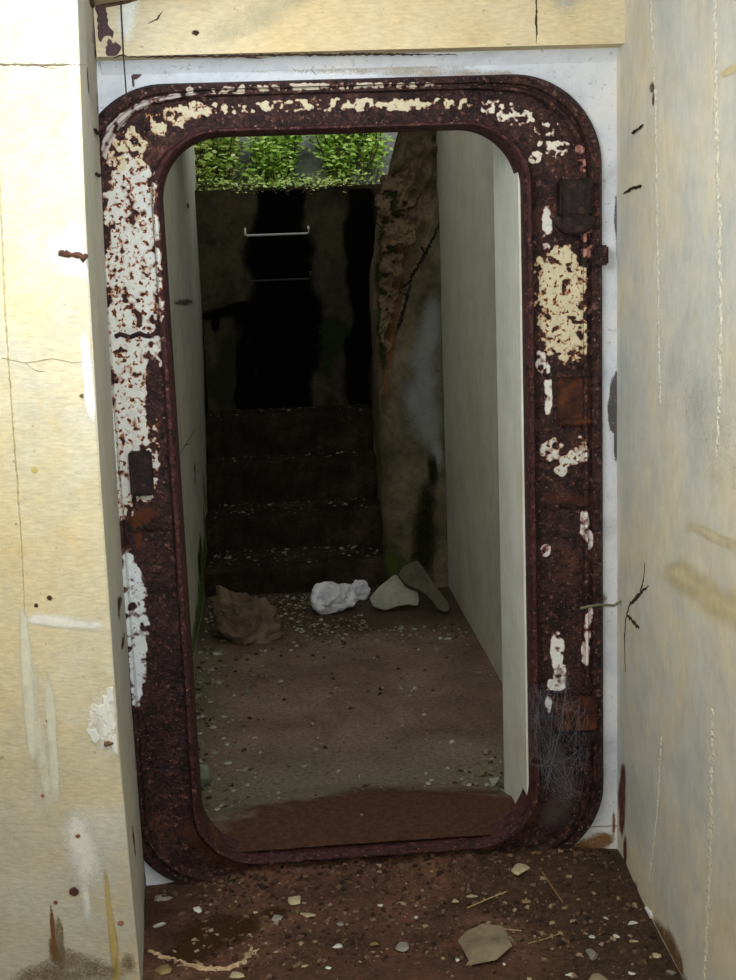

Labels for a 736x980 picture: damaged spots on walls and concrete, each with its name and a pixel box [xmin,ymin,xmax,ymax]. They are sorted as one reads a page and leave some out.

crack [0,62,86,70]
crack [532,0,540,40]
peeling [101,82,592,521]
peeling [122,548,150,707]
corrosion [617,763,627,861]